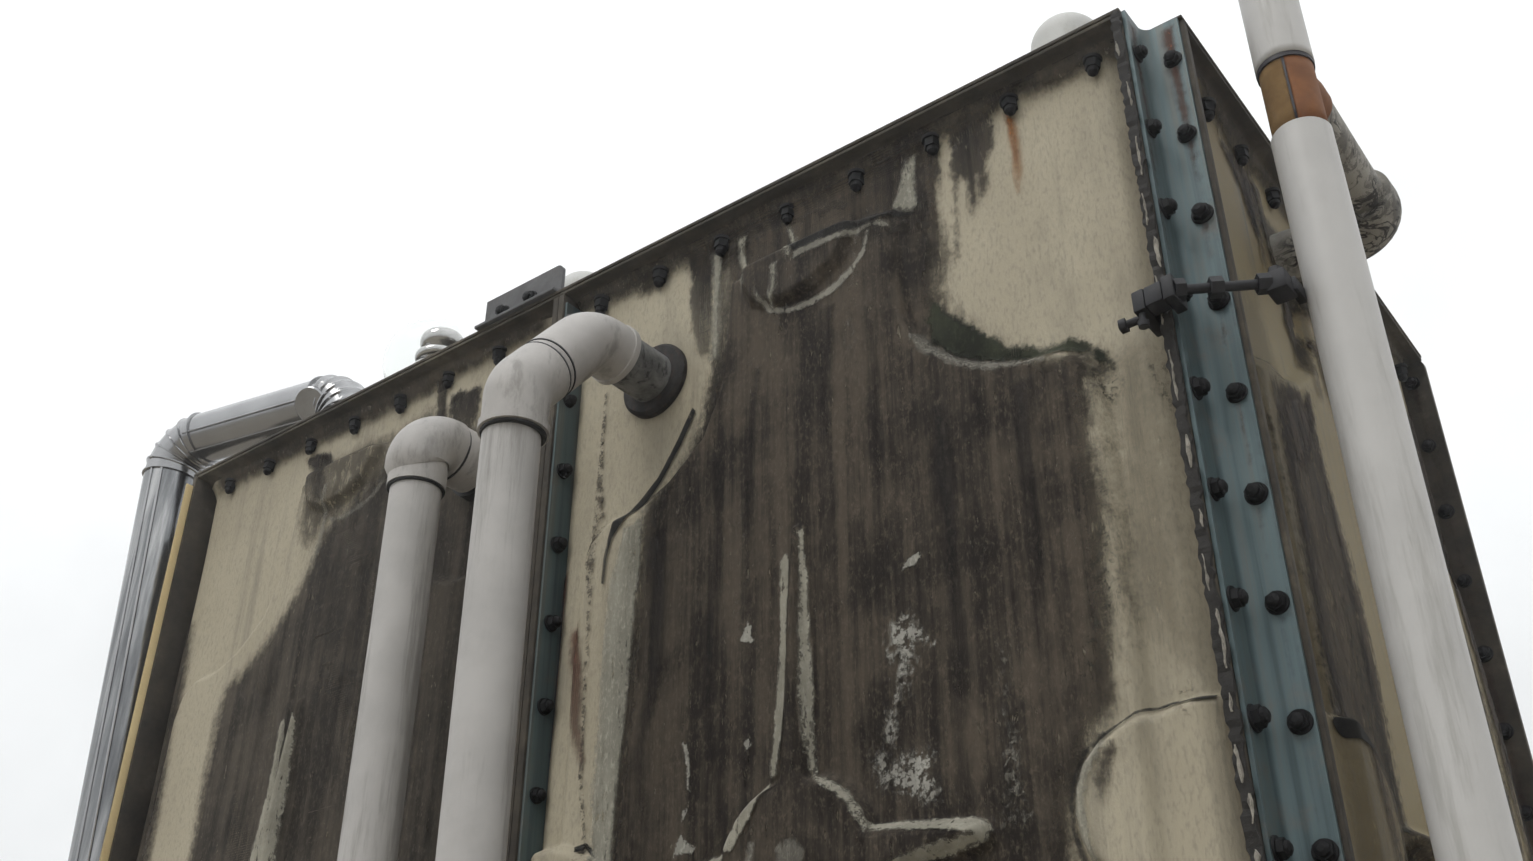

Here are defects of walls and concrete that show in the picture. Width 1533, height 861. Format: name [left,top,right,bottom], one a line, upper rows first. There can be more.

corrosion [1005,114,1017,157]
water stain [136,624,191,861]
water stain [188,316,546,861]
peeling [673,743,694,858]
peeling [710,528,991,861]
water stain [578,39,1217,861]